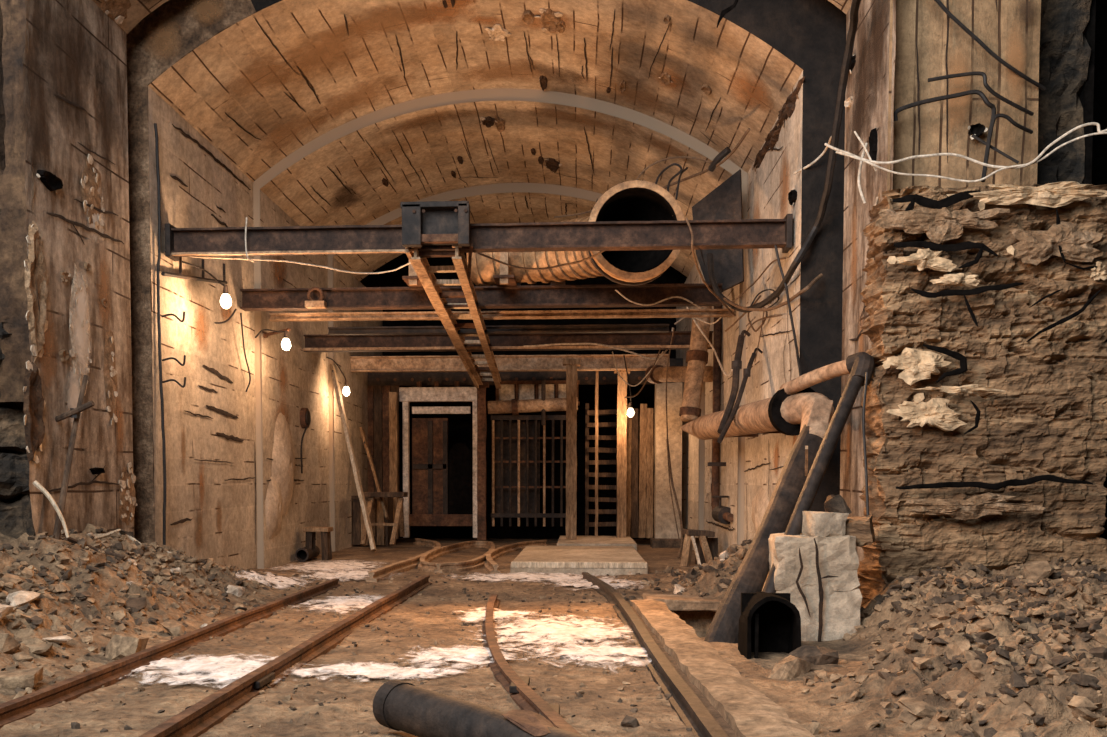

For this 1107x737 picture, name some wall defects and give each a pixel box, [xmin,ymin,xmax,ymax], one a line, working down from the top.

spalling [522,8,566,33]
spalling [752,76,805,172]
spalling [904,492,1045,520]